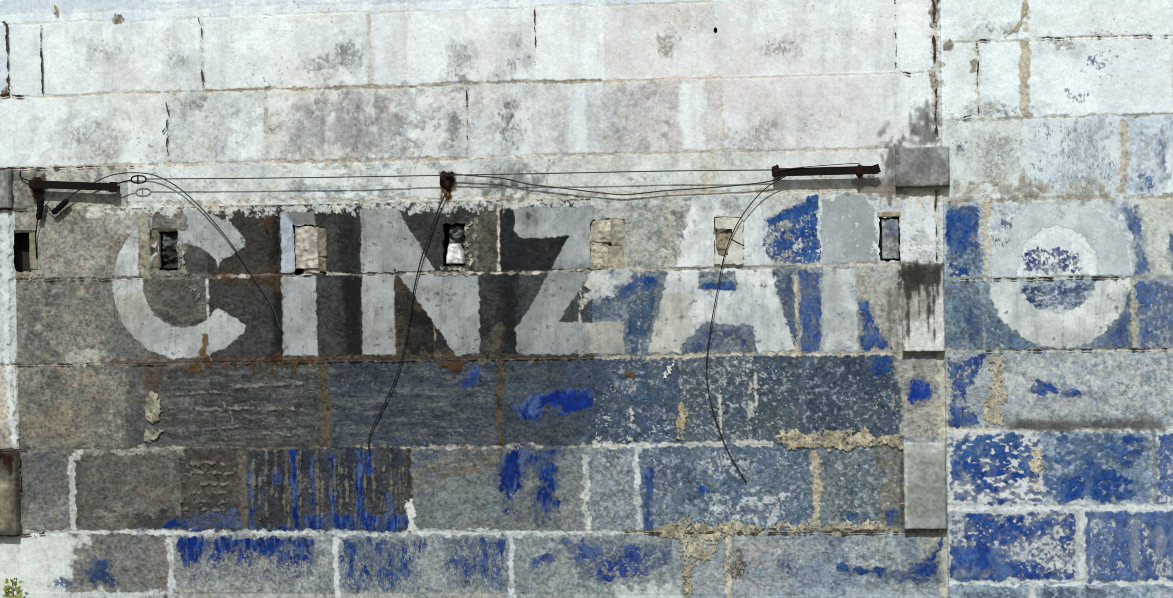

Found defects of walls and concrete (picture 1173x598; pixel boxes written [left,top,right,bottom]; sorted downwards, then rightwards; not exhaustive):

rust [439,171,457,204]
leakage [897,260,944,339]
rust [143,333,326,394]
peeling [511,386,594,420]
peeling [836,293,1173,598]
peeling [159,435,430,594]